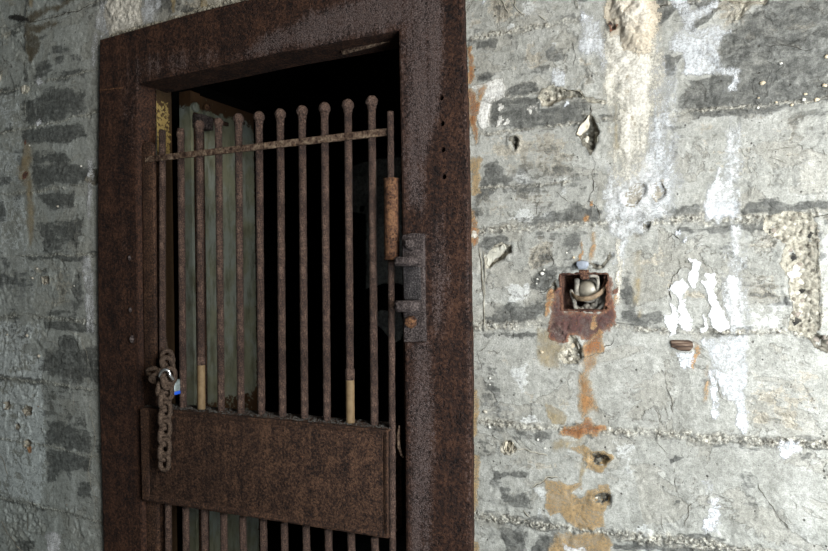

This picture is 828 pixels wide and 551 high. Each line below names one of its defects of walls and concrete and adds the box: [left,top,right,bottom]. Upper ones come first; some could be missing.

rust [468,46,487,143]
spalling [537,85,607,155]
rust [470,157,483,196]
rust [471,211,480,246]
spalling [763,211,828,353]
rust [538,277,618,551]